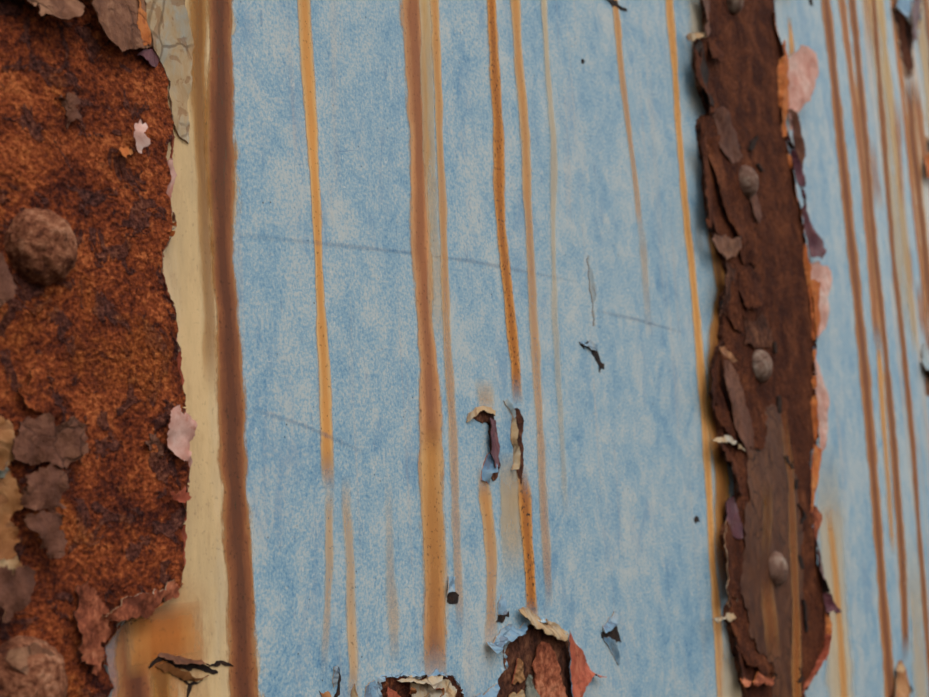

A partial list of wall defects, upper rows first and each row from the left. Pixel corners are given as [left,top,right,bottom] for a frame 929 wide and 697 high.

peeling [0,252,17,307]
peeling [26,0,195,311]
corrosion [73,0,264,697]
corrosion [297,0,334,469]
corrosion [400,0,450,656]
peeling [466,399,524,484]
corrosion [487,0,521,386]
corrosion [665,0,809,697]
corrosion [821,0,929,697]
peeling [891,0,922,80]
peeling [319,666,341,697]
peeling [351,594,605,697]